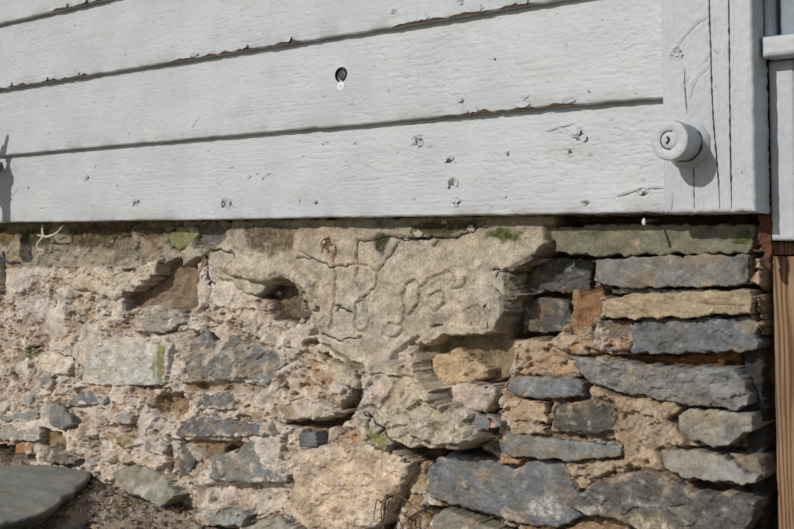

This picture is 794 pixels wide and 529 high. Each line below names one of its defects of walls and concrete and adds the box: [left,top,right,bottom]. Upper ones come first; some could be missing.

peeling [441,96,579,117]
peeling [571,129,587,142]
crack [303,220,486,271]